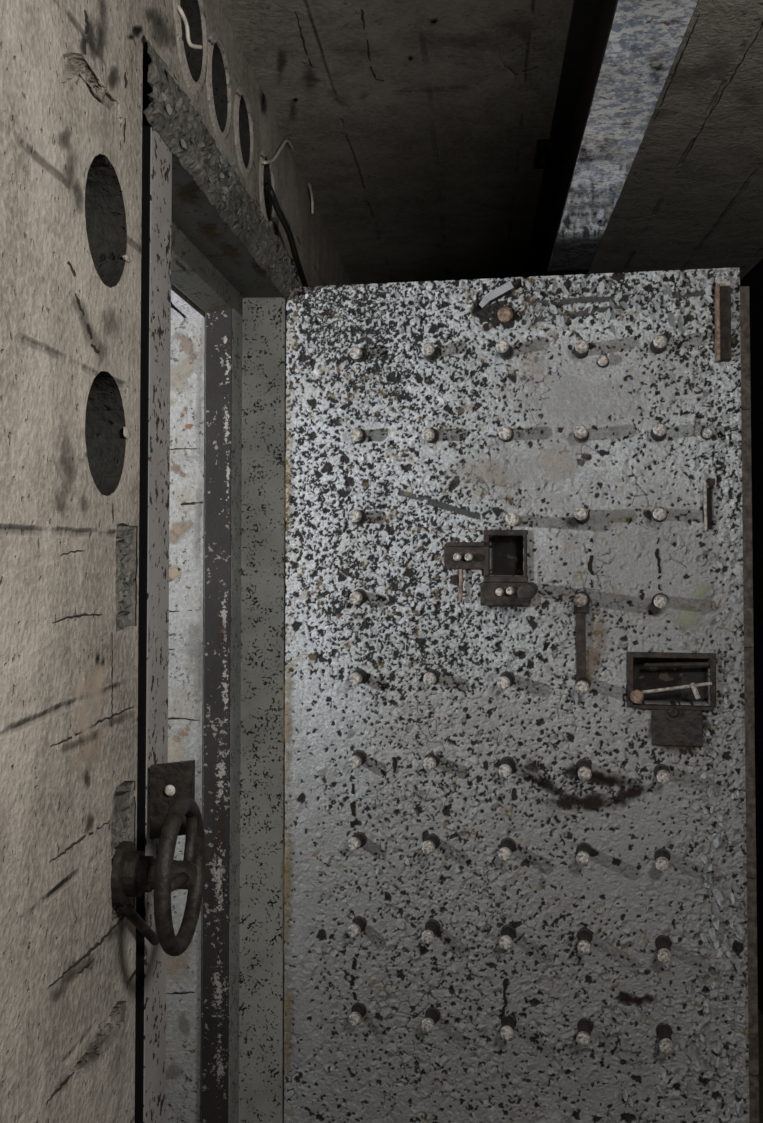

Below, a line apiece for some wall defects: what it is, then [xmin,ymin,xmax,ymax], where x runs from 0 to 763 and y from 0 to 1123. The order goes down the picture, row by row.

peeling [222,336,232,509]
peeling [215,580,229,820]
peeling [212,838,227,932]
peeling [211,950,228,1088]